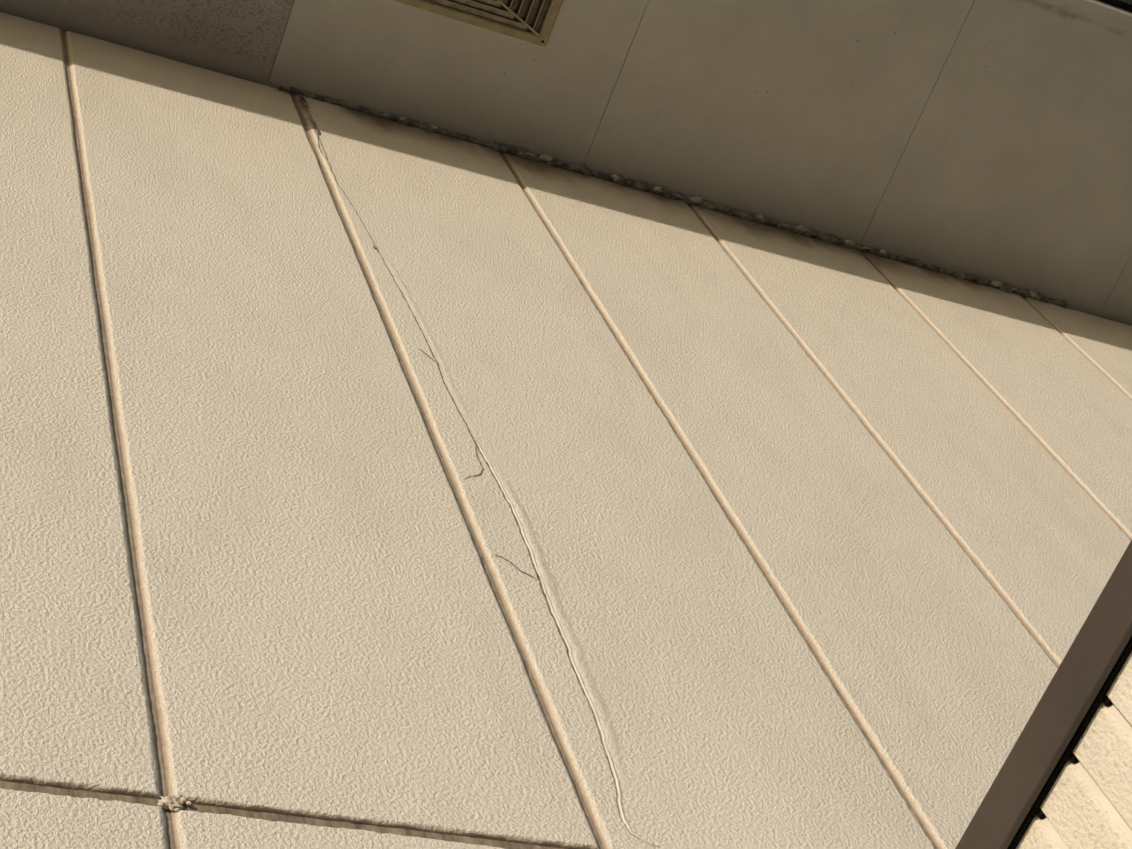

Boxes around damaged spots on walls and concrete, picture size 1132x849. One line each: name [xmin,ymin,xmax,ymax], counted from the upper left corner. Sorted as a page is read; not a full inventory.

crack [301,103,656,846]